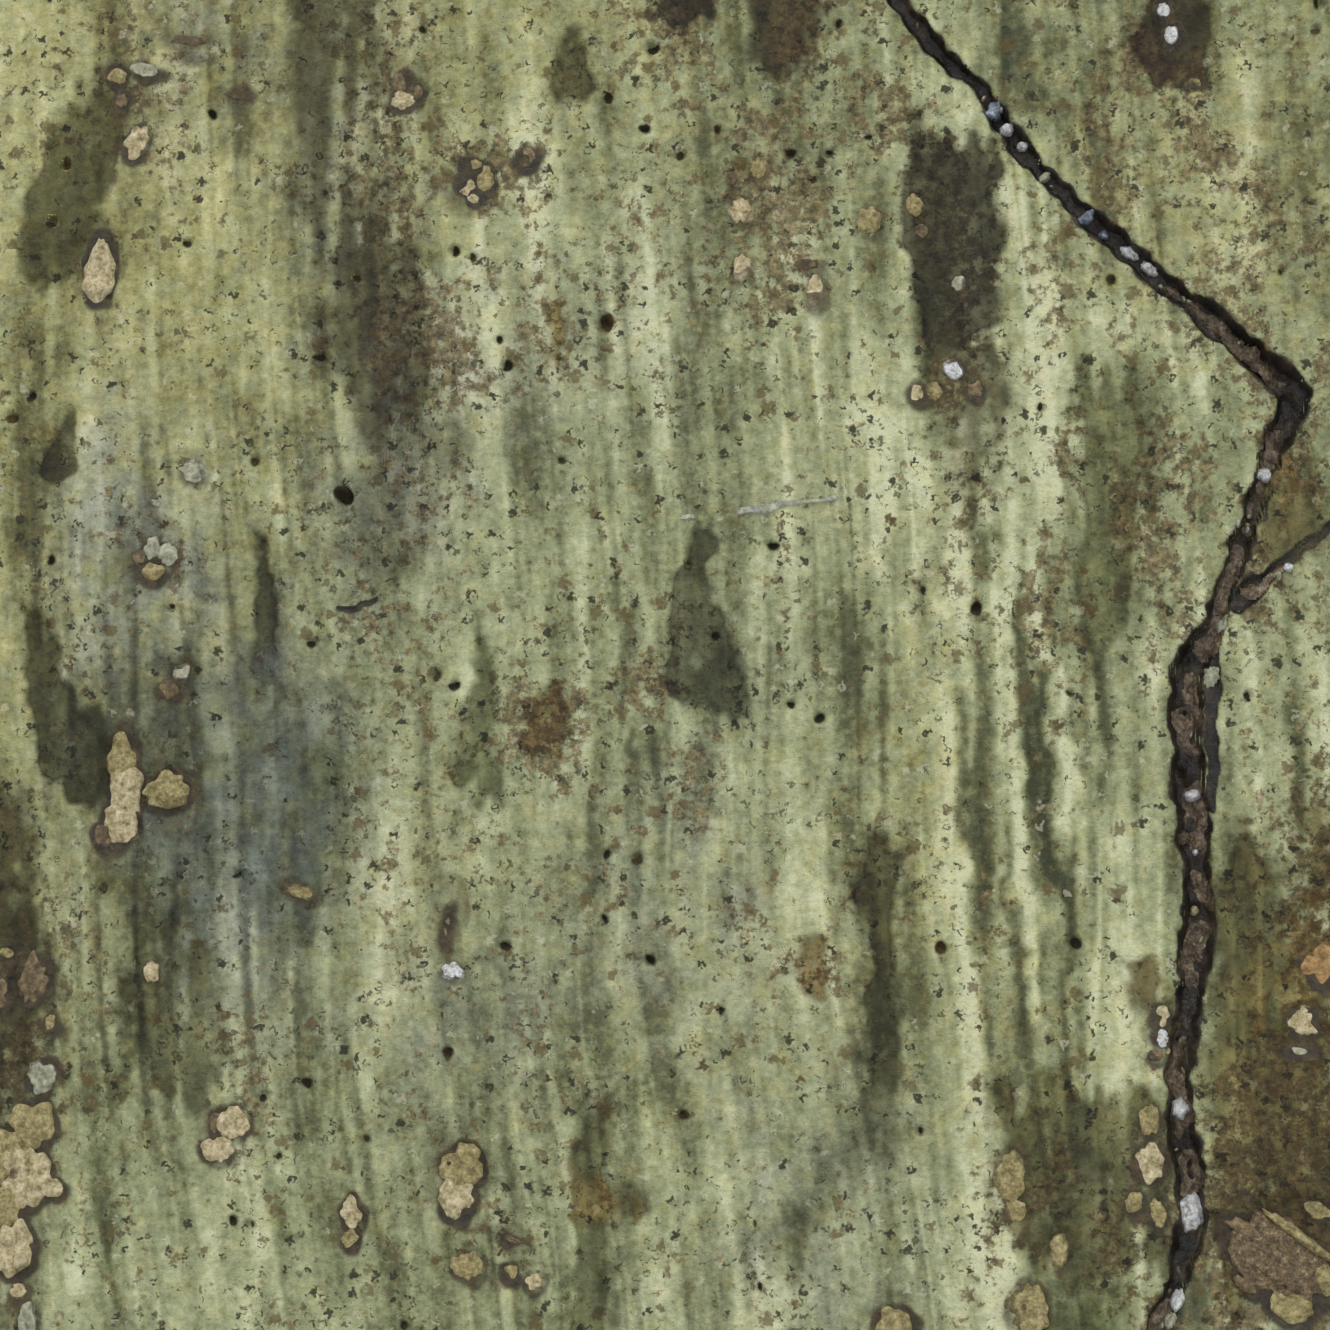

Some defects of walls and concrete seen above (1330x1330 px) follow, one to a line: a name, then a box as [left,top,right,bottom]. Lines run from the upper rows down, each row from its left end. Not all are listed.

crack [886,0,1330,1330]